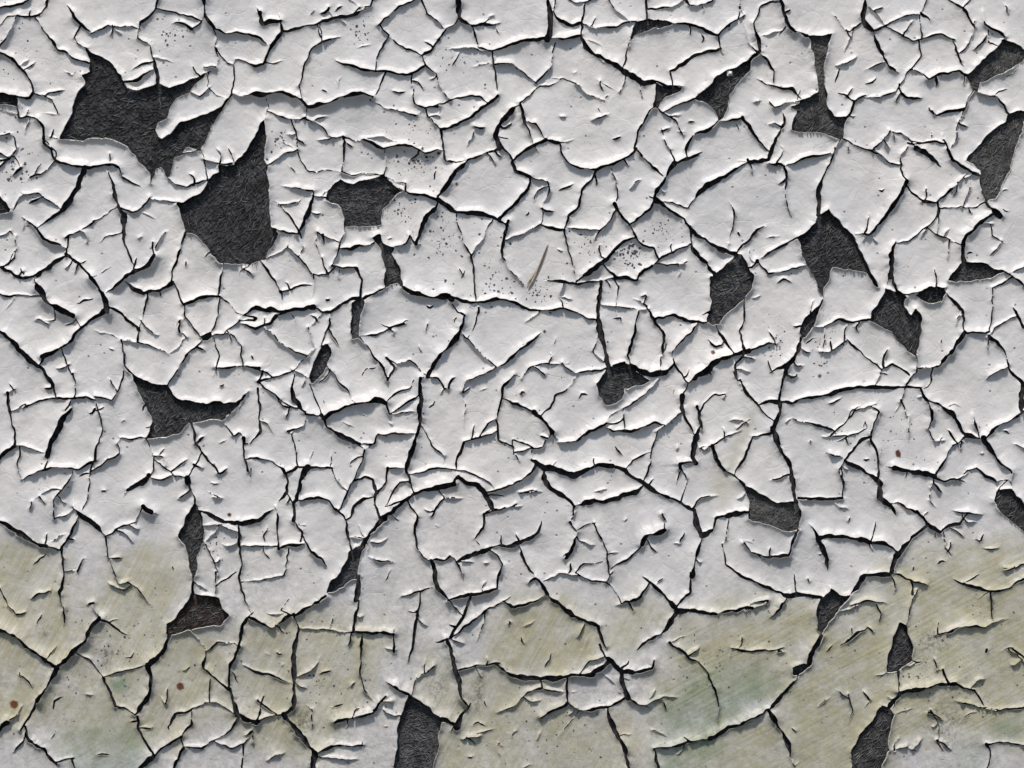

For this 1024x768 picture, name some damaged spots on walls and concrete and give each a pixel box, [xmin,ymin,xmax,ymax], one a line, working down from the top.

peeling [643,49,761,132]
crack [749,0,807,104]
crack [835,0,1004,120]
peeling [49,38,289,275]
crack [859,89,1008,302]
peeling [957,101,1024,211]
peeling [300,166,413,394]
peeling [787,200,1015,367]
peeling [112,331,258,449]
crack [124,422,227,505]
crack [0,595,364,768]
crack [653,674,798,768]